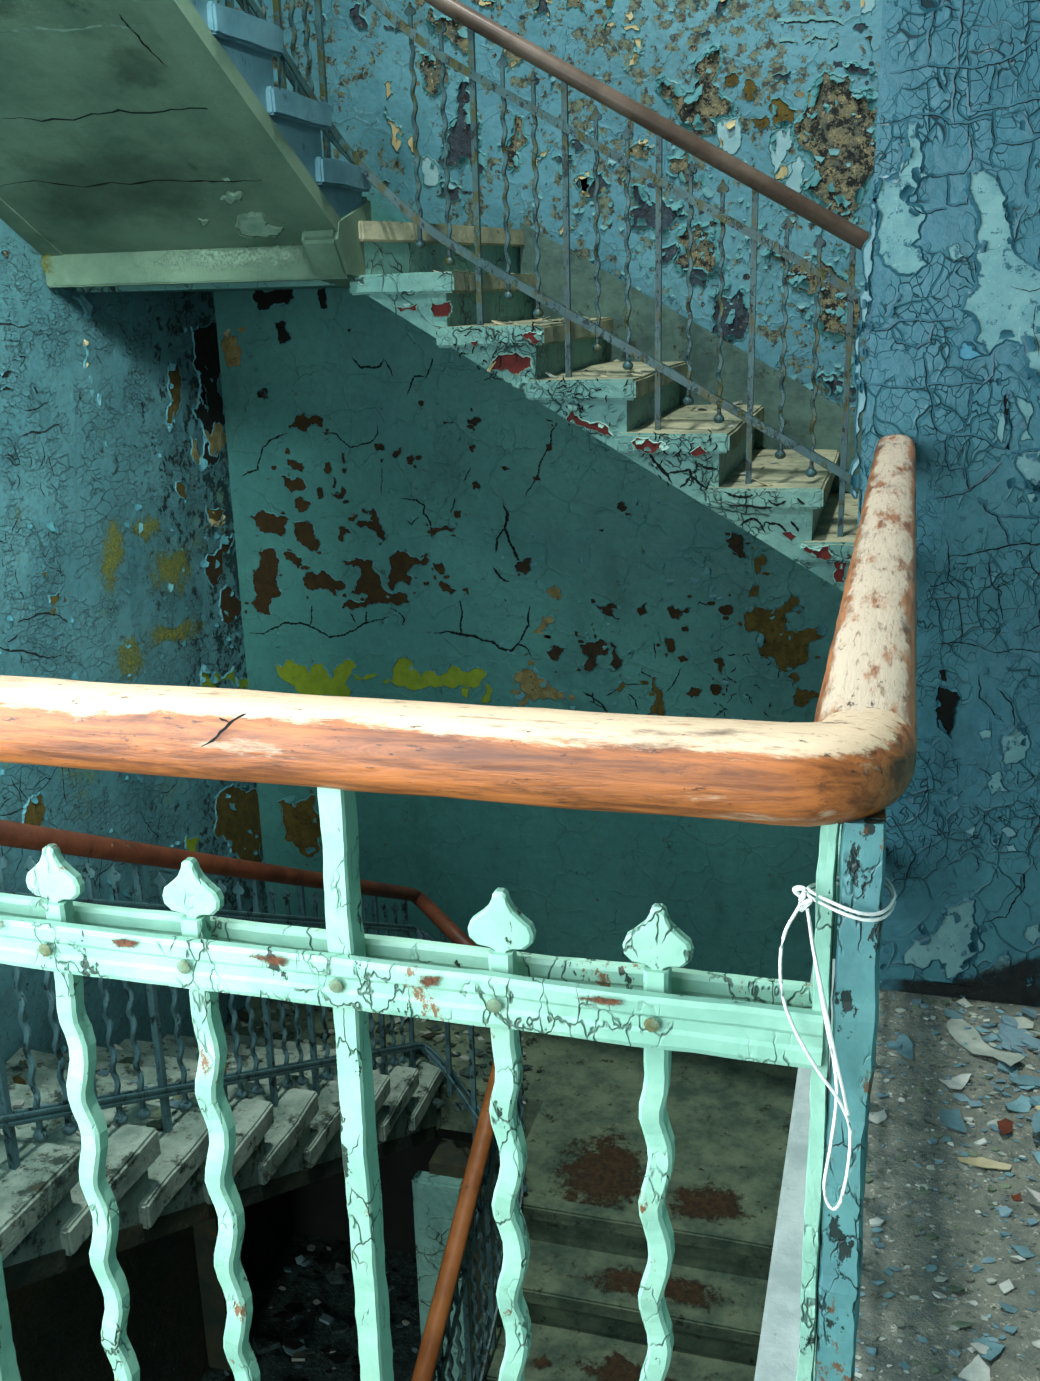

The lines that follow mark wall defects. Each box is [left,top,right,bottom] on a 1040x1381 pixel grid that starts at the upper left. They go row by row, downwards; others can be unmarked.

crack [0,323,70,659]
crack [3,107,208,122]
peeling [200,447,469,628]
peeling [273,655,494,704]
peeling [383,0,488,203]
crack [250,322,628,657]
peeling [615,138,750,344]
crack [640,429,805,533]
peeling [653,0,934,499]
crack [866,317,1040,725]
crack [878,0,1040,373]
peeling [947,166,1040,503]